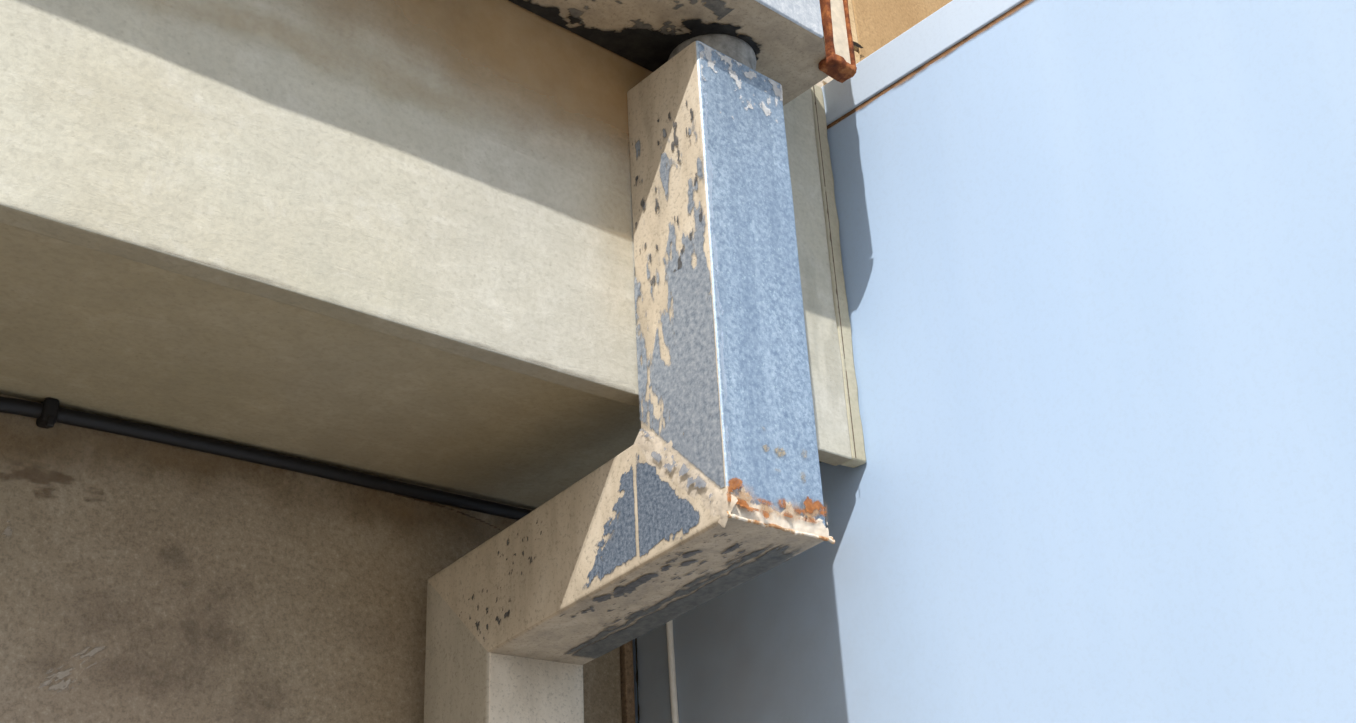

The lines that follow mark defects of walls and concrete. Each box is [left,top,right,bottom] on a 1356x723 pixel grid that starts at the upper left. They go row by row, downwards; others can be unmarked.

peeling [628,0,734,35]
peeling [699,42,783,121]
peeling [561,101,829,659]
corrosion [727,478,827,522]
peeling [459,587,510,638]